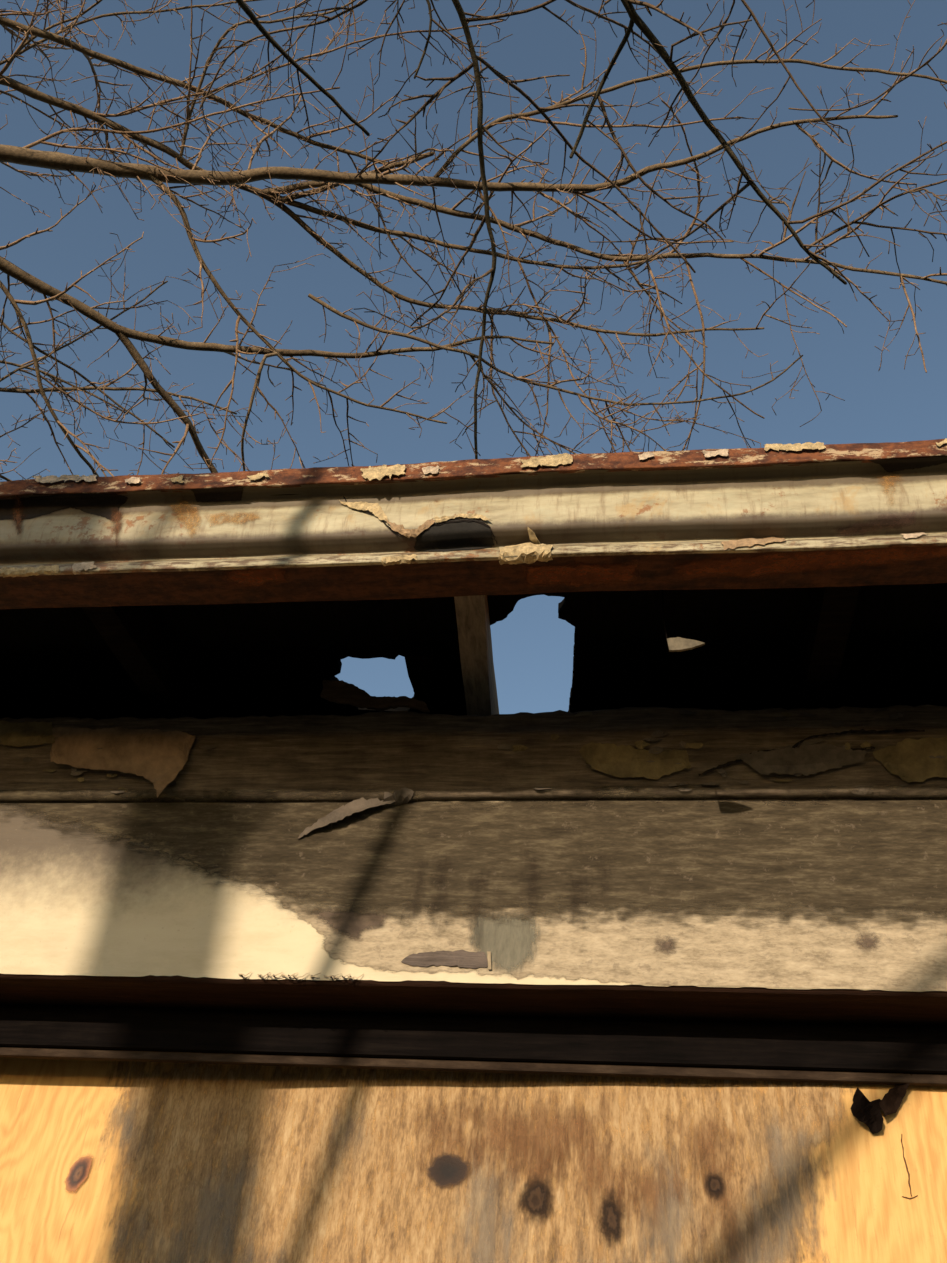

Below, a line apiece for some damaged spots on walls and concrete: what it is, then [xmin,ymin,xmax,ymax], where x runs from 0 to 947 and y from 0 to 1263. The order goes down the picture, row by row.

peeling [0,561,97,577]
rust [112,510,122,545]
rust [172,501,259,534]
spalling [339,500,553,566]
peeling [721,537,787,550]
rust [677,543,947,578]
peeling [50,723,217,797]
peeling [579,724,691,785]
peeling [845,736,947,783]
peeling [401,950,492,970]
damp [109,1061,852,1263]